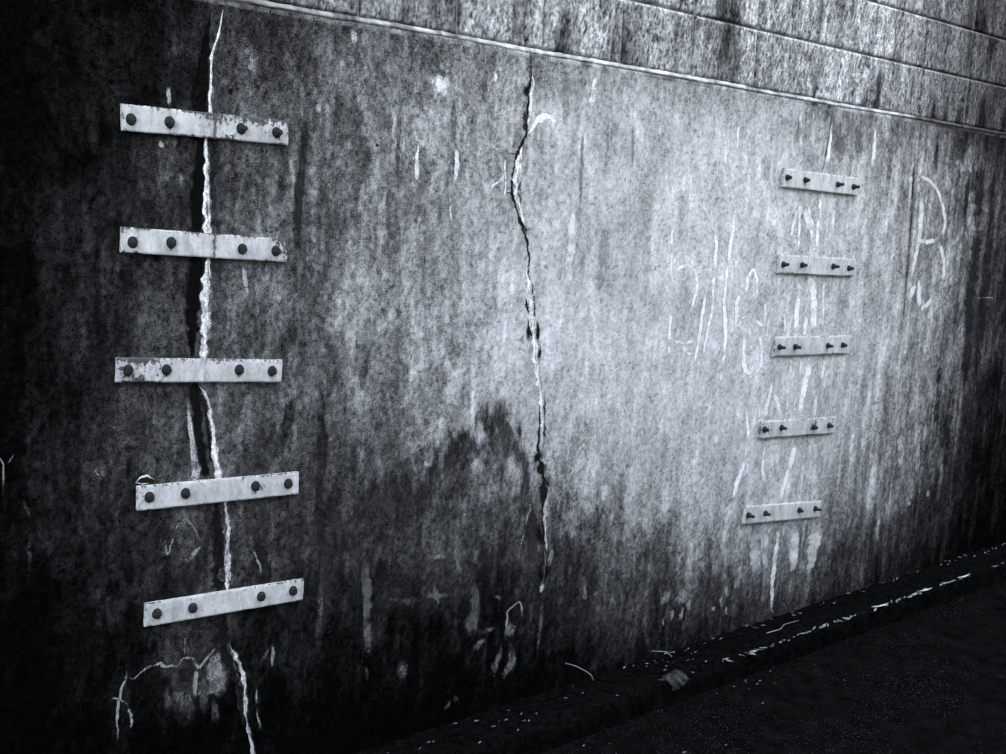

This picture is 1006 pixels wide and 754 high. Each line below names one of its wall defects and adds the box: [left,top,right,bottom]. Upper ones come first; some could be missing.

crack [196,12,223,113]
crack [190,137,212,233]
crack [184,256,211,359]
crack [488,26,556,649]
crack [187,382,223,480]
leakage [280,401,295,440]
leakage [313,395,572,585]
crack [113,502,261,754]
crack [266,646,275,666]